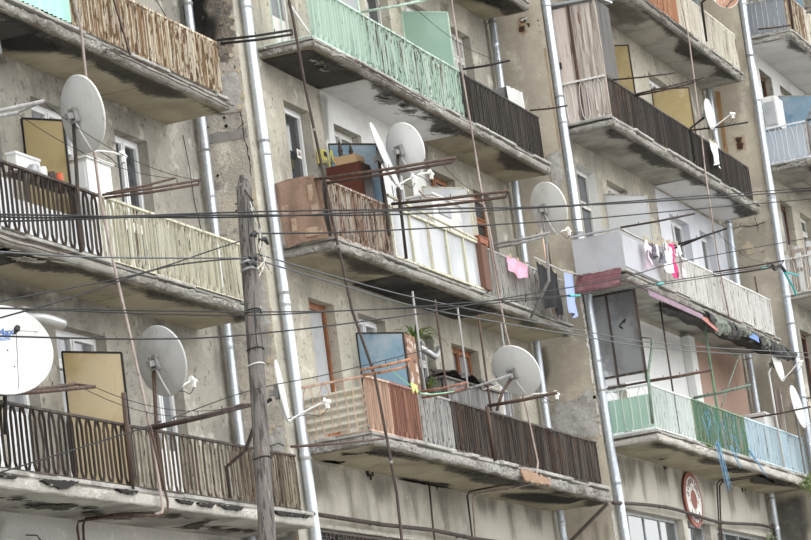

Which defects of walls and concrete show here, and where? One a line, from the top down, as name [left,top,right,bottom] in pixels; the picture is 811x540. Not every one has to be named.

water stain [310,50,545,176]
water stain [606,129,757,218]
spalling [0,233,72,263]
spalling [551,296,601,438]